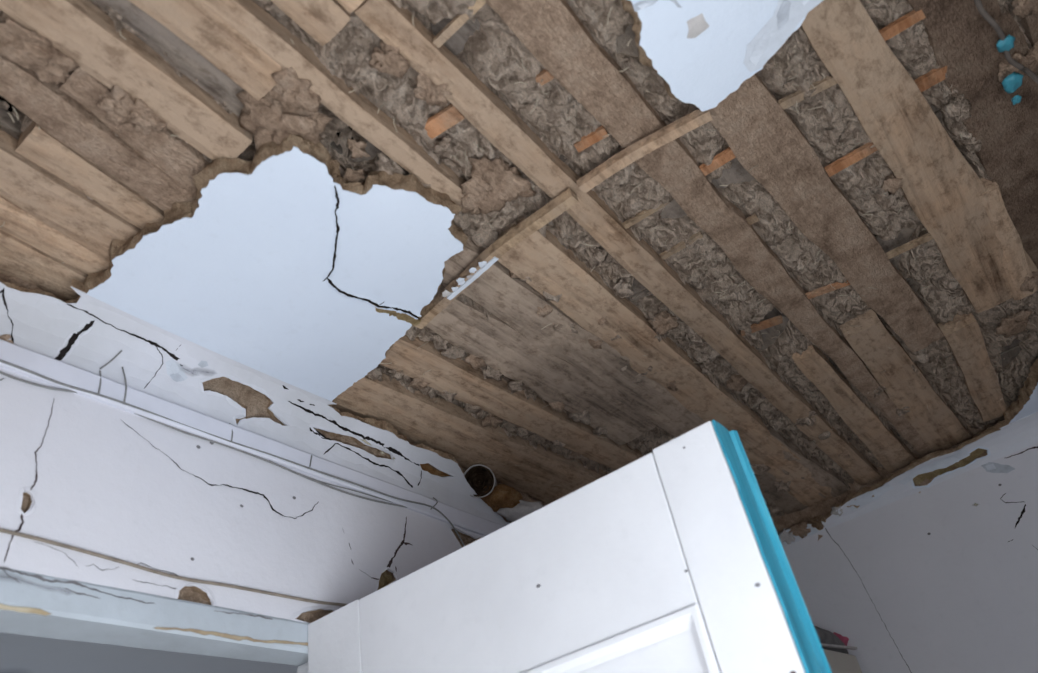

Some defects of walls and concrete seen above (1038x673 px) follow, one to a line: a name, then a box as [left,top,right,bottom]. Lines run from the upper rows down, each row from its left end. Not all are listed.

peeling [744,0,823,72]
crack [322,185,422,326]
crack [0,288,14,343]
crack [51,304,183,388]
flaking render [166,358,290,428]
crack [30,402,54,490]
crack [120,419,318,519]
flaking render [309,424,395,464]
spalling [770,420,1015,546]
crack [0,514,178,604]
flaking render [174,581,217,606]
flaking render [449,526,485,549]